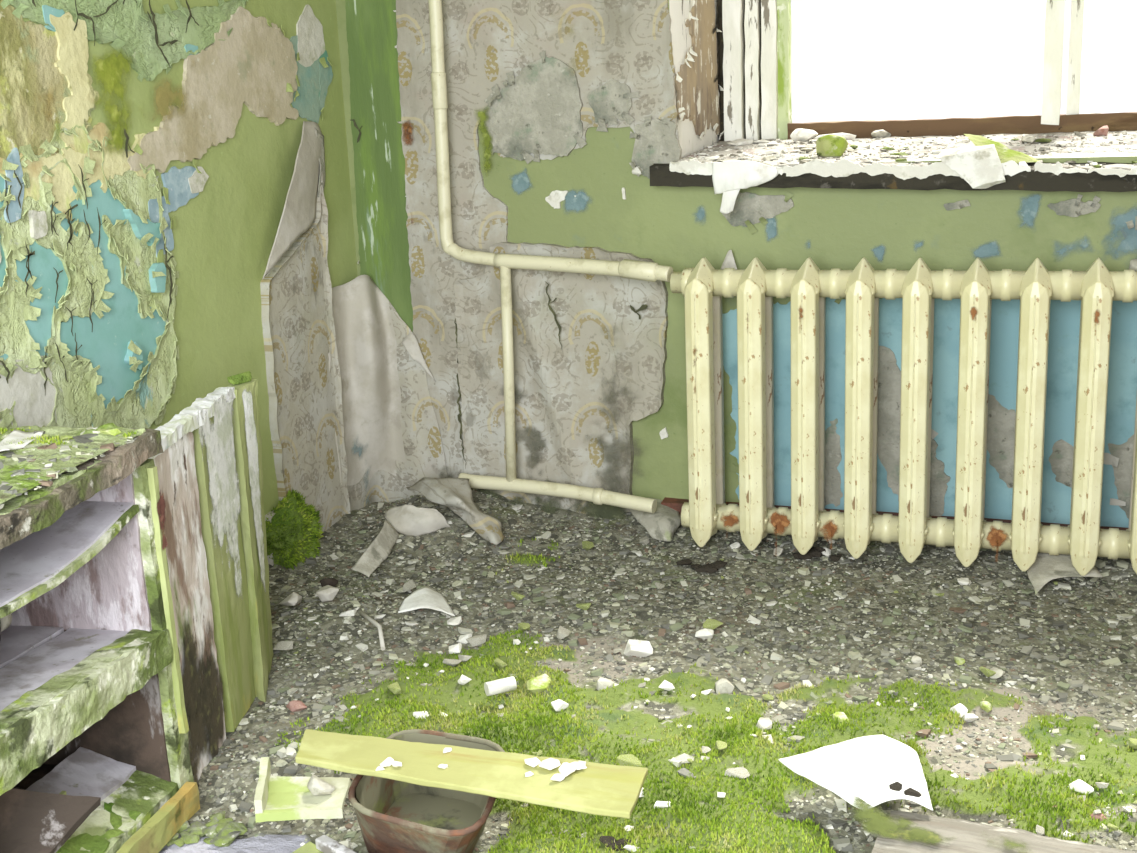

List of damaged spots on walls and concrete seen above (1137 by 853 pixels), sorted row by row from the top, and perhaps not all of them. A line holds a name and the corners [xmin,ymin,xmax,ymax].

crack [74,0,199,68]
spalling [484,0,729,194]
crack [0,360,10,384]
crack [5,164,106,394]
peeling [0,0,333,459]
crack [164,236,173,321]
peeling [825,297,846,510]
flaking render [876,298,903,513]
peeling [929,299,961,516]
peeling [984,299,1020,520]
peeling [1041,300,1081,524]
peeling [1100,301,1137,528]